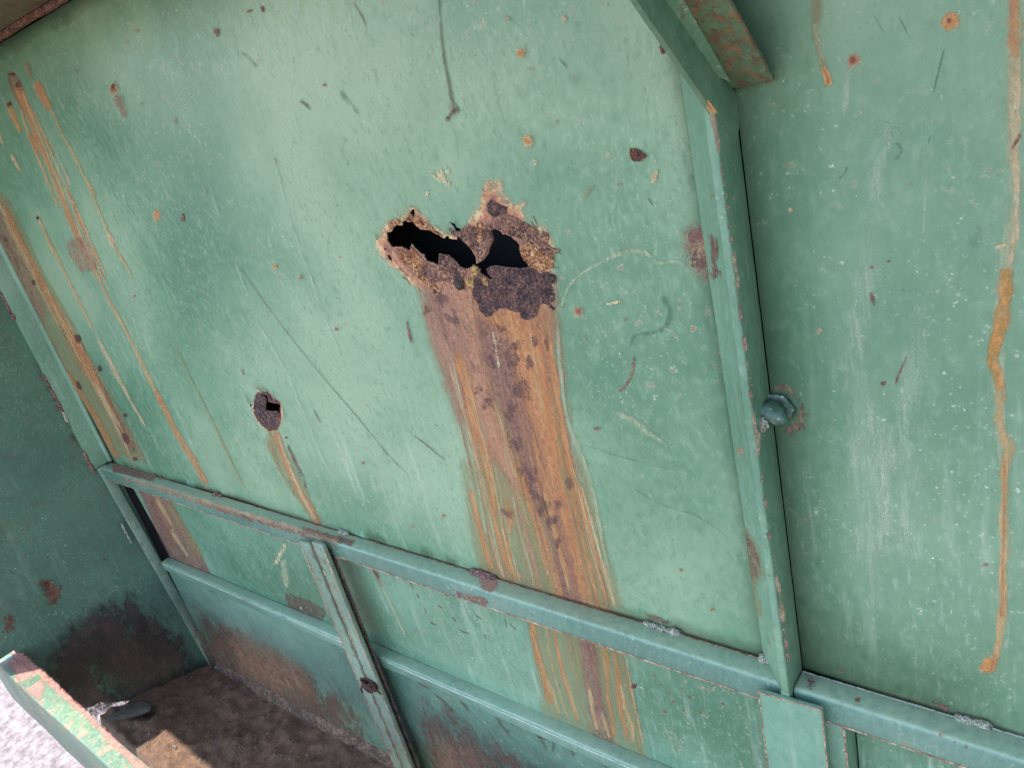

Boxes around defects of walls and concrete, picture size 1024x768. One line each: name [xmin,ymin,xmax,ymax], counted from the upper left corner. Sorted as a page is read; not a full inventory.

corrosion [7,63,207,484]
corrosion [0,195,354,574]
corrosion [374,180,621,611]
corrosion [980,0,1021,673]
corrosion [39,580,62,606]
corrosion [8,597,200,768]
corrosion [530,623,644,756]